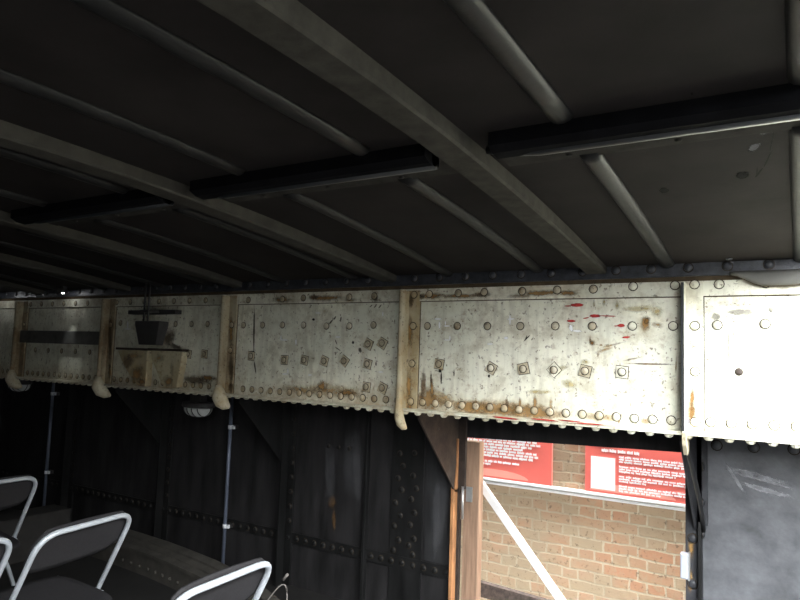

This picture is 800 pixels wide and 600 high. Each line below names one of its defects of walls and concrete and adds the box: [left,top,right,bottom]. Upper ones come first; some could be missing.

rust [185,375,216,384]
rust [292,381,357,395]
rust [407,372,560,418]